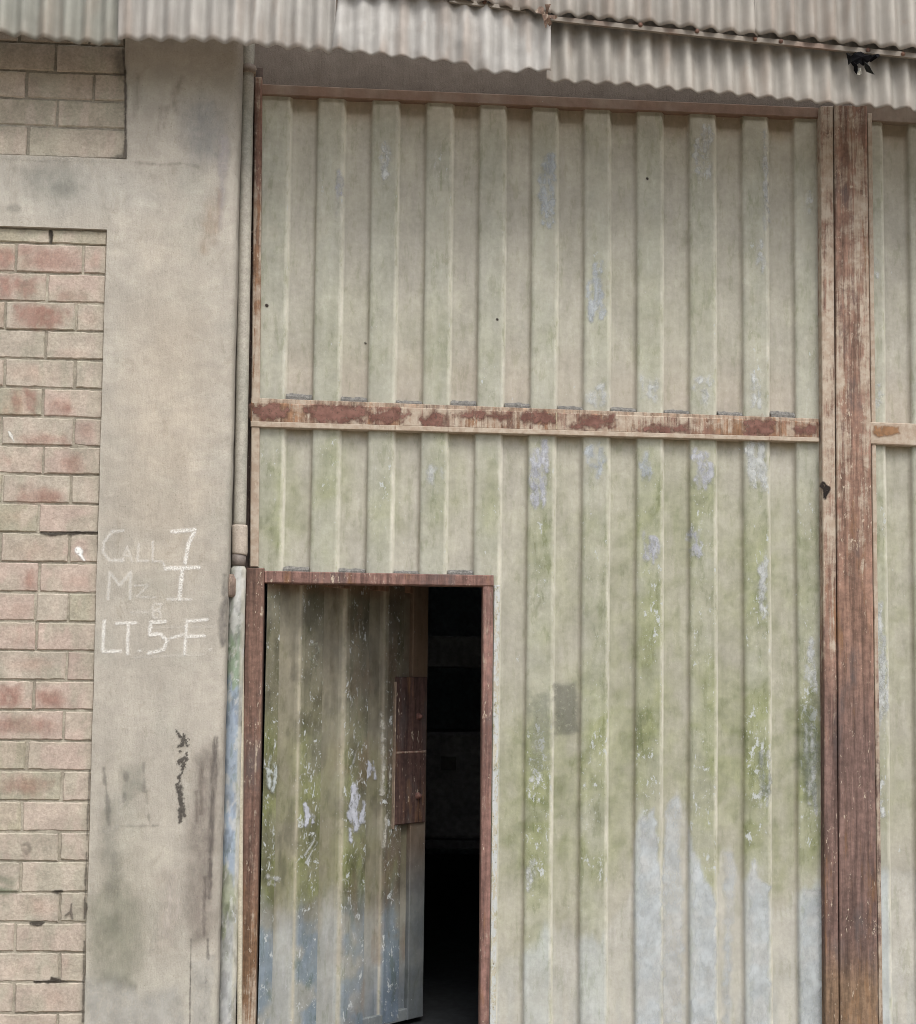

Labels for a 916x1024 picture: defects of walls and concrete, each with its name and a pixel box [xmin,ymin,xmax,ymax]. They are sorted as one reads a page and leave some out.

rust [250,402,290,421]
rust [303,404,556,427]
rust [571,413,615,431]
rust [643,424,687,433]
rust [743,419,776,436]
rust [873,426,899,437]
spalling [367,715,392,796]
spalling [303,802,315,827]
spalling [347,784,366,842]
leakage [175,730,217,959]
leakage [637,800,730,1024]
leakage [802,890,822,1024]